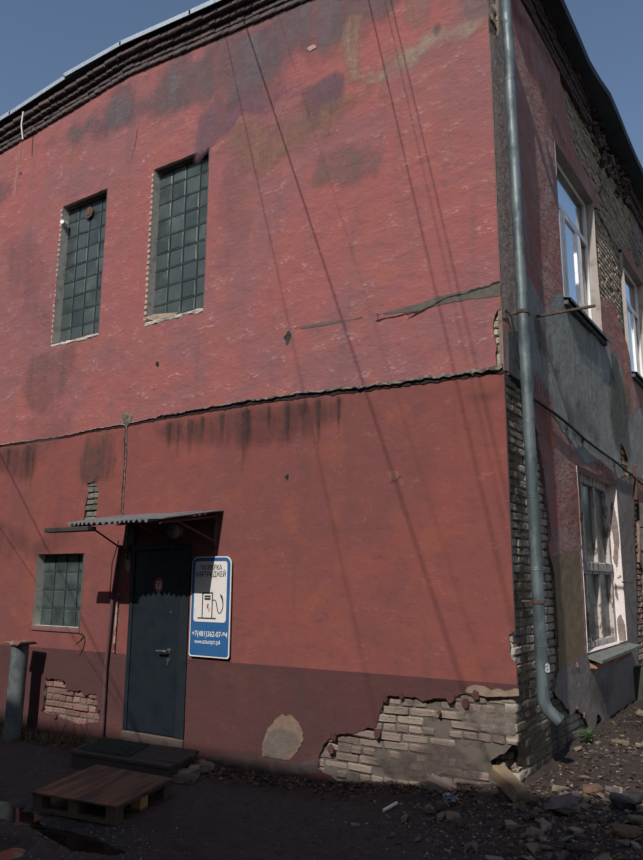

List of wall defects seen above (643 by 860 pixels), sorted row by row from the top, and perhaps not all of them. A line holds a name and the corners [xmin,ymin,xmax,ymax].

leakage [72,0,393,169]
crack [0,363,503,516]
peeling [283,317,362,345]
crack [375,281,500,321]
peeling [319,0,643,784]
flaking render [40,676,100,724]